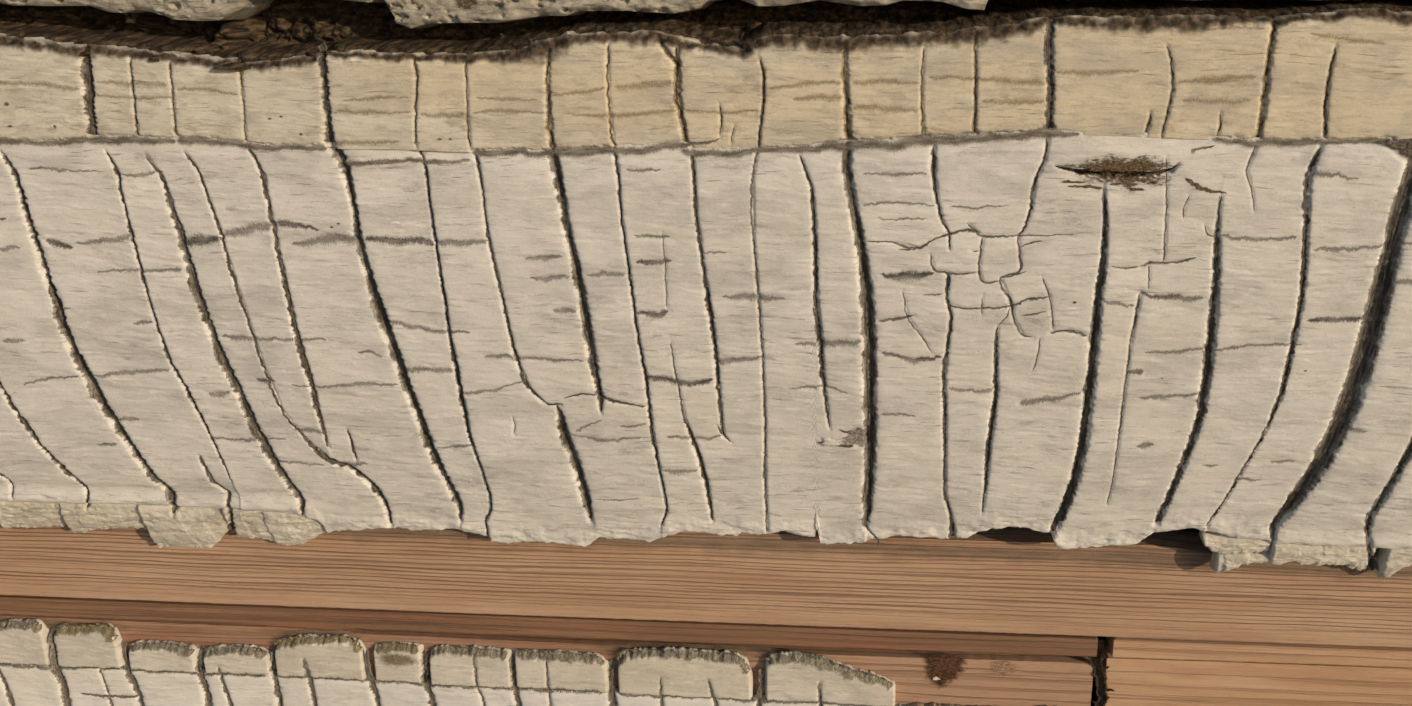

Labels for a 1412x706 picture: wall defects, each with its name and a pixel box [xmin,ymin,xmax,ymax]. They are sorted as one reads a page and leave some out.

crack [0,17,1412,547]
peeling [0,501,327,548]
peeling [1199,531,1412,578]
crack [1364,438,1412,571]
peeling [0,618,896,706]
crack [0,627,906,706]
crack [1086,640,1114,706]